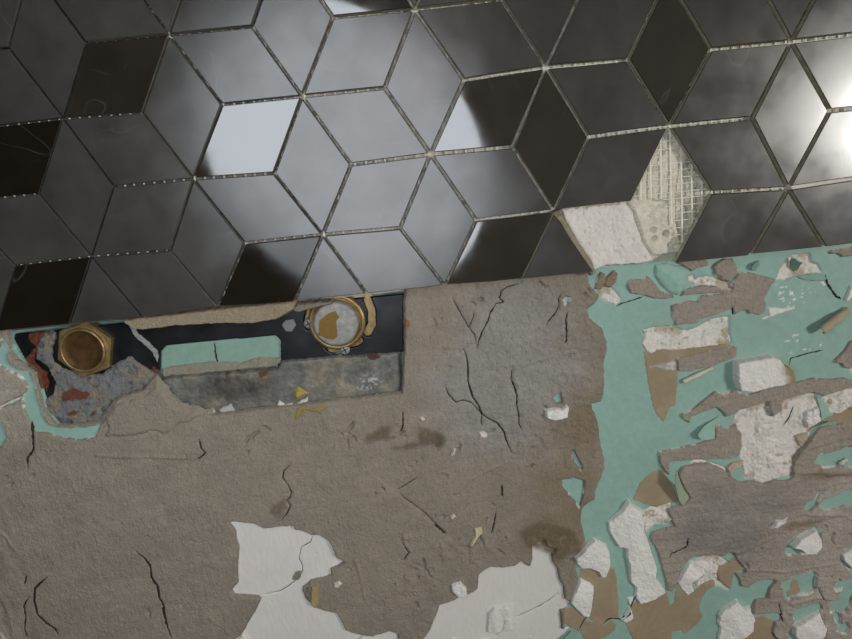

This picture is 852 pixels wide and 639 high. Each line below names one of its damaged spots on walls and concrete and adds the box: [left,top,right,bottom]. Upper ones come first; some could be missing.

flaking render [562,201,653,269]
flaking render [776,254,825,286]
crack [444,283,522,454]
flaking render [641,316,731,422]
flaking render [733,387,852,483]
crack [23,576,58,636]
crack [136,551,172,639]
flaking render [231,522,398,639]
damp [524,525,579,559]
flaking render [424,543,744,639]
peeling [633,470,679,530]
peeling [744,615,775,639]